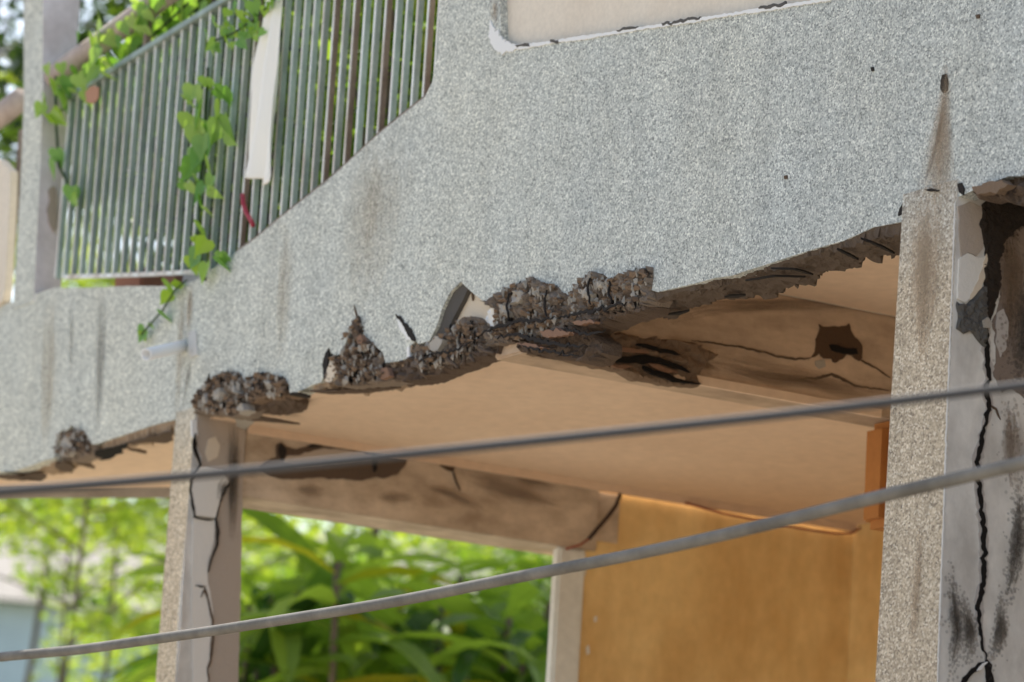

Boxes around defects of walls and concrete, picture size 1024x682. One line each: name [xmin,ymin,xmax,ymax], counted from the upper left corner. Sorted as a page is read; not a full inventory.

spalling [21,421,175,475]
crack [0,431,230,682]
flaking render [191,223,902,682]
crack [615,340,891,391]
crack [961,332,1001,682]
spalling [974,480,989,671]
peeling [956,177,1024,468]